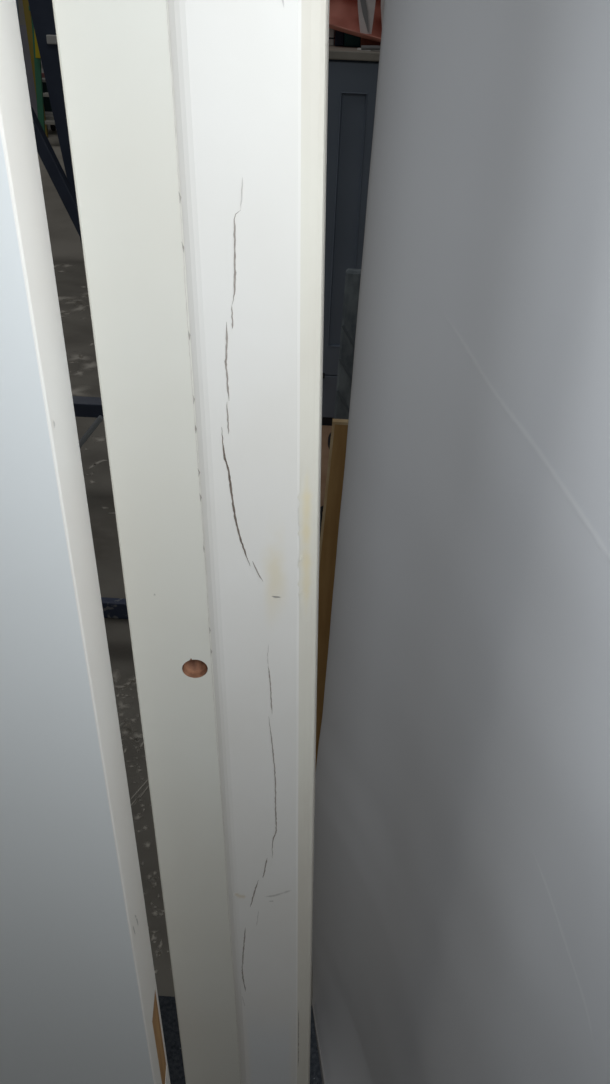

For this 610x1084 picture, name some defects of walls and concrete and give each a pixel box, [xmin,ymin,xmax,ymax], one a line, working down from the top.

crack [166,0,277,1084]